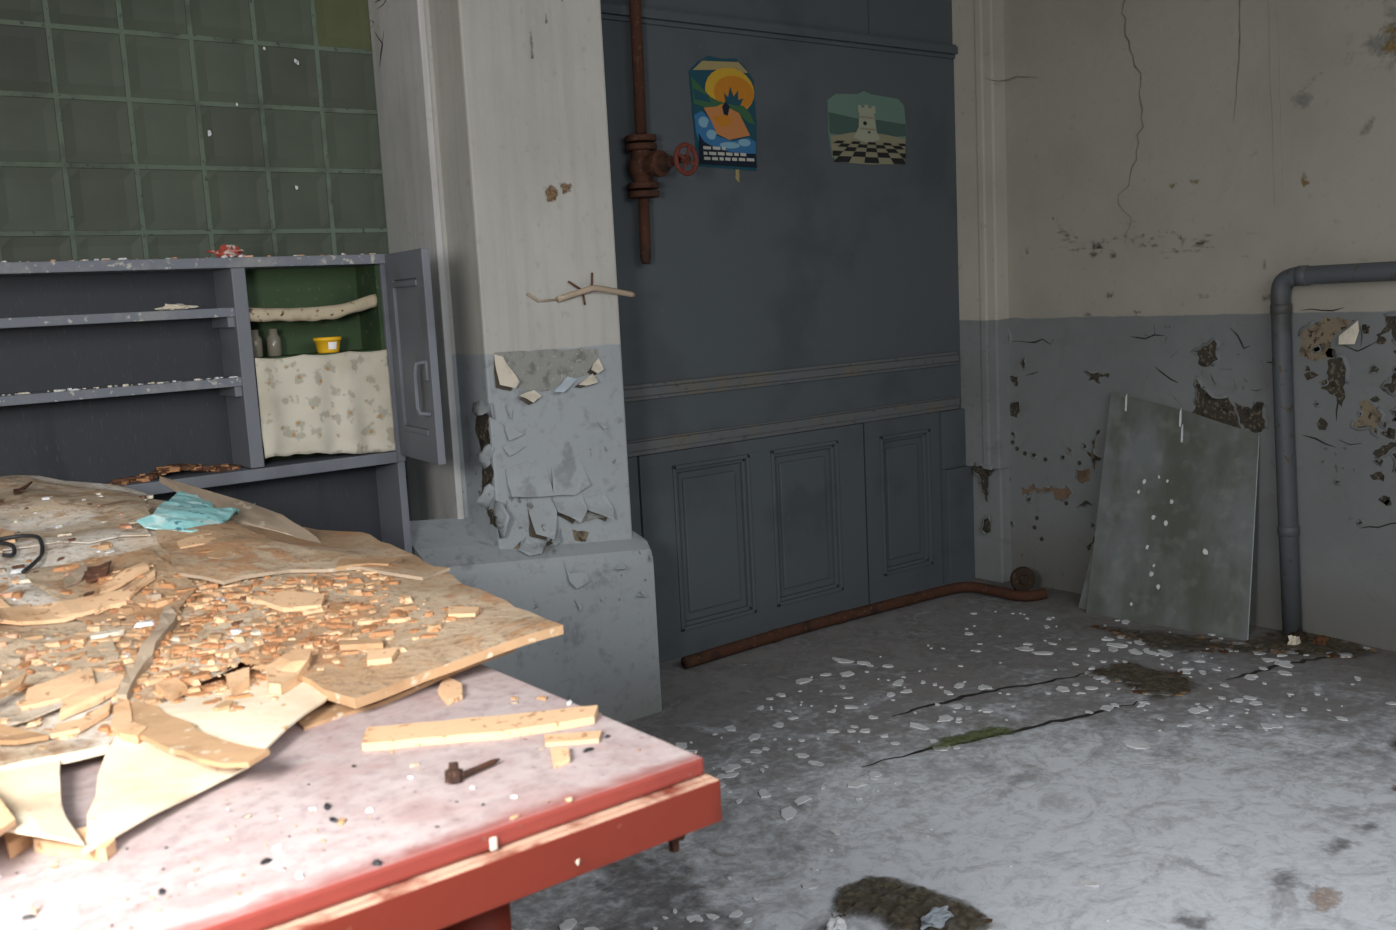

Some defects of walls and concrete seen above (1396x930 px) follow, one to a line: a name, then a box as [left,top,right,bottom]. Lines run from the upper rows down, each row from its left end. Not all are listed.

crack [1233,0,1241,114]
crack [1118,0,1144,244]
peeling [1191,337,1269,433]
peeling [1298,313,1396,506]
peeling [472,400,614,556]
crack [893,673,1085,716]
crack [862,700,1146,767]
crack [1226,652,1358,680]